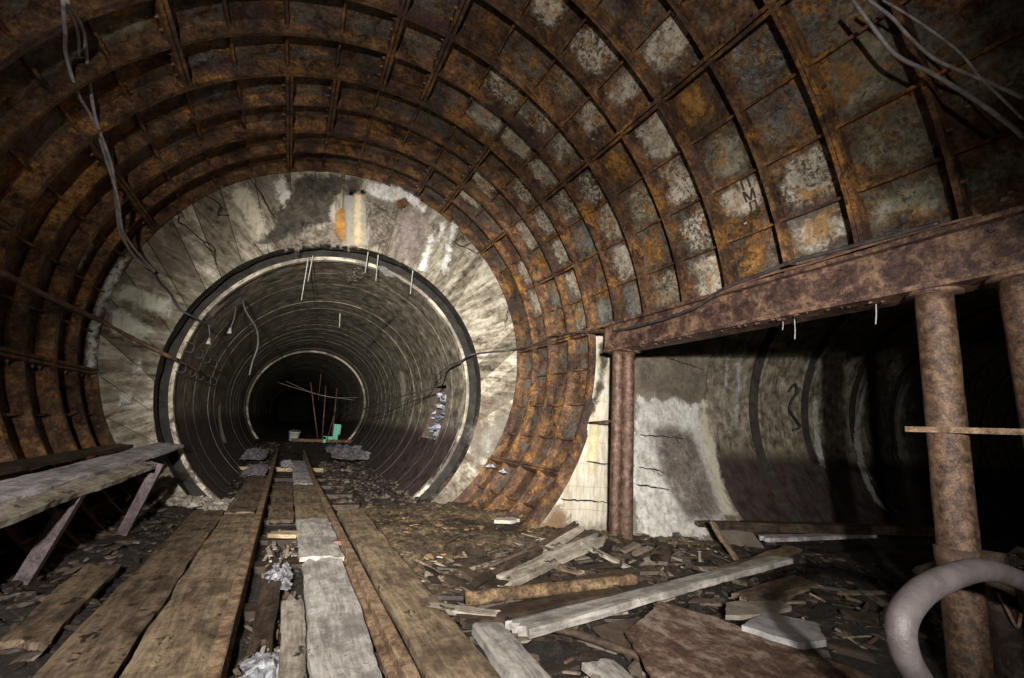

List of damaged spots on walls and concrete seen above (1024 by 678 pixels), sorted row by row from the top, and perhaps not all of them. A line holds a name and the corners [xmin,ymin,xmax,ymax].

rust [678,84,713,126]
leakage [232,173,458,275]
rust [335,194,363,245]
rust [735,240,766,274]
leakage [633,344,737,539]
crack [637,467,669,490]
rust [531,505,571,529]